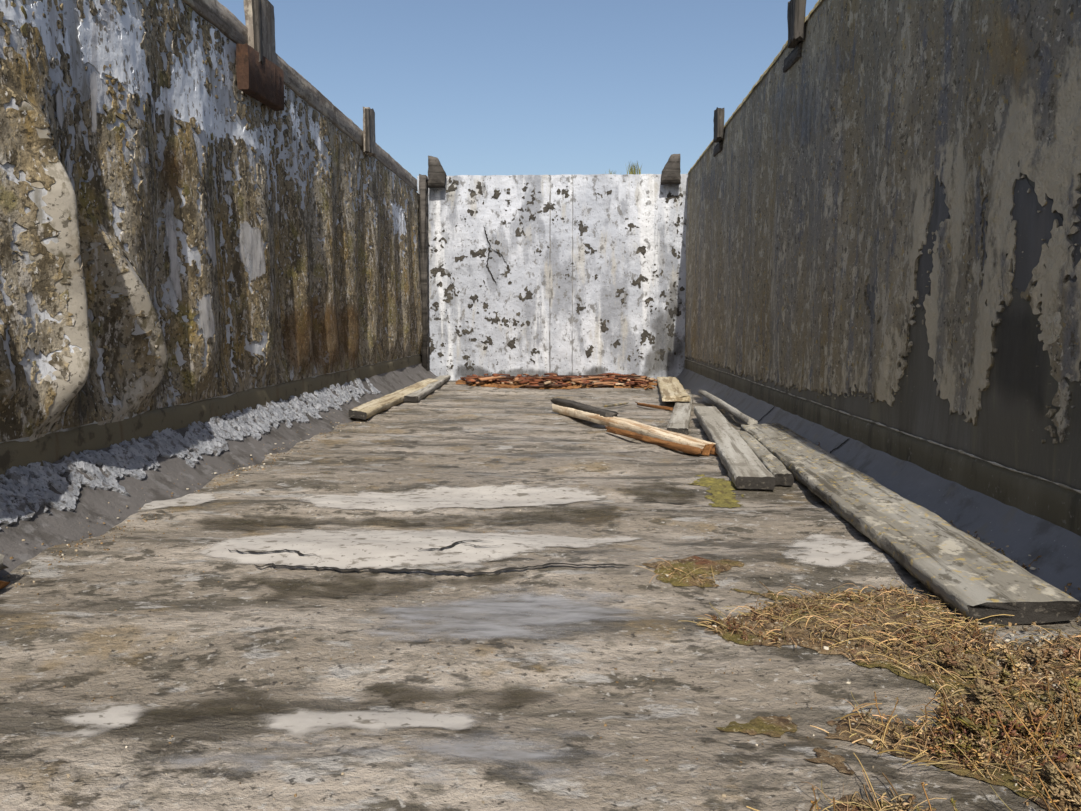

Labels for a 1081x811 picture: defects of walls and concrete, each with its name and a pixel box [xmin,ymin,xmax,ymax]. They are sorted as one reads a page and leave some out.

peeling [0,0,271,163]
peeling [289,102,321,151]
spalling [429,237,540,371]
spalling [429,177,597,298]
spalling [600,318,676,362]
spalling [615,192,686,337]
spalling [916,177,950,312]
spalling [1011,178,1081,293]